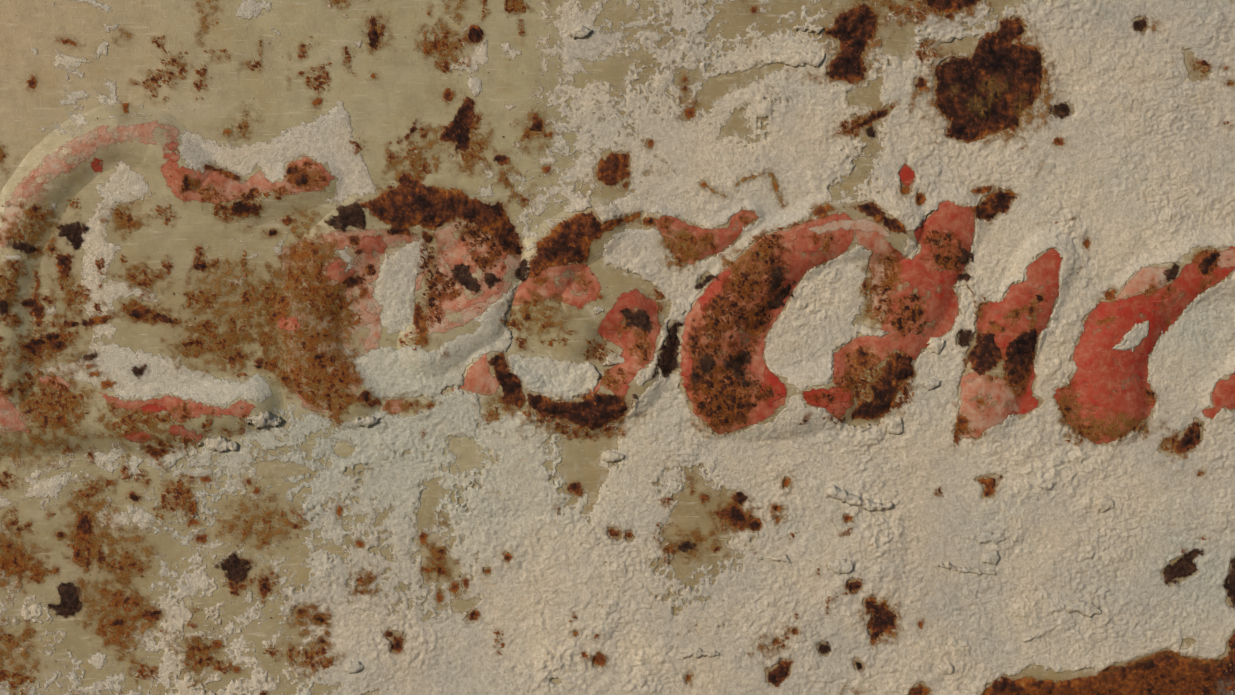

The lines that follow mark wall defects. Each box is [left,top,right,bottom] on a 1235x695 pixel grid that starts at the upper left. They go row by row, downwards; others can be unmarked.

rust [810,0,990,84]
rust [835,16,1053,143]
peeling [0,0,377,318]
peeling [502,0,872,351]
peeling [99,392,255,423]
peeling [273,229,430,353]
rust [0,0,915,489]
peeling [764,213,890,391]
rust [957,295,1047,396]
peeling [0,447,95,517]
rust [0,456,173,684]
rust [981,633,1235,695]